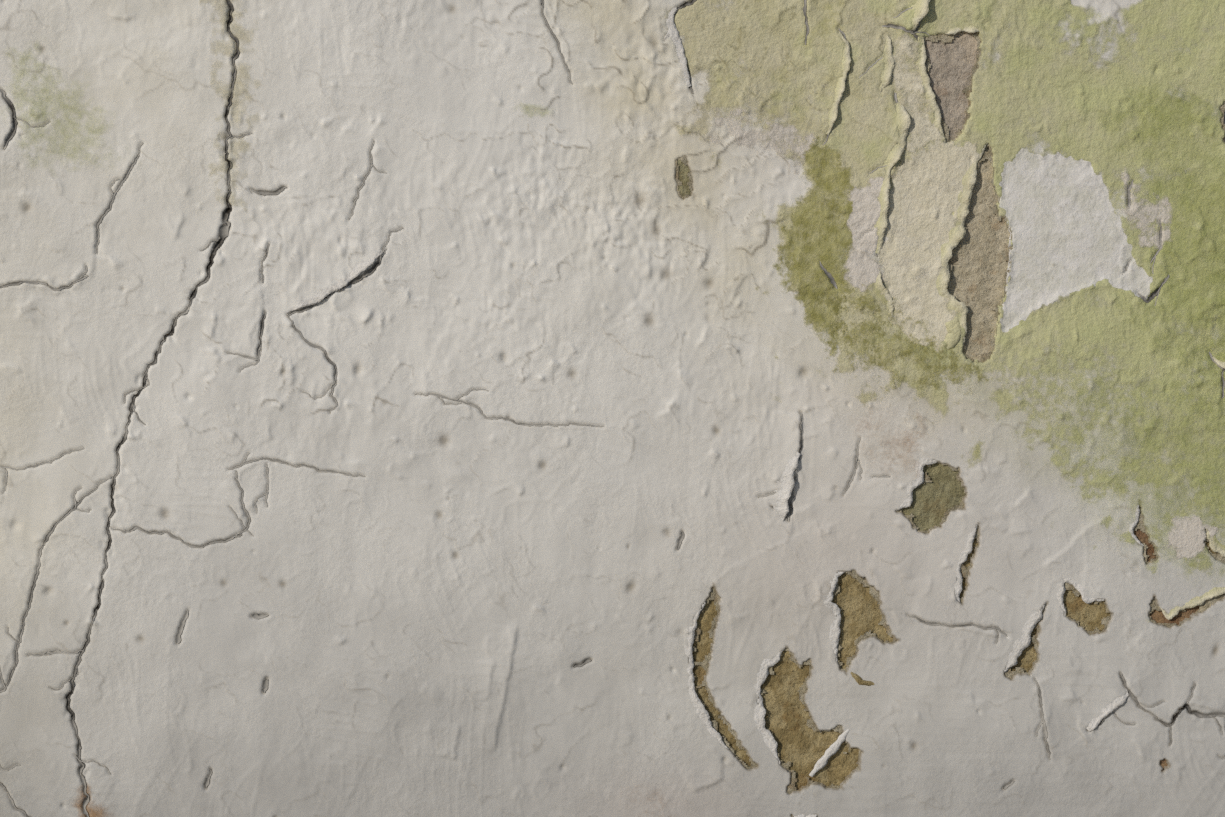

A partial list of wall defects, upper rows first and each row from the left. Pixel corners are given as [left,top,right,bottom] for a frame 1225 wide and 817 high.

crack [348,140,386,220]
crack [226,227,403,414]
peeling [670,0,1225,573]
crack [0,0,363,817]
crack [415,389,604,427]
peeling [682,587,757,769]
peeling [754,647,862,794]
peeling [823,570,898,686]
crack [1034,678,1050,760]
peeling [1004,578,1111,679]
crack [1086,673,1225,759]
peeling [1149,587,1225,628]